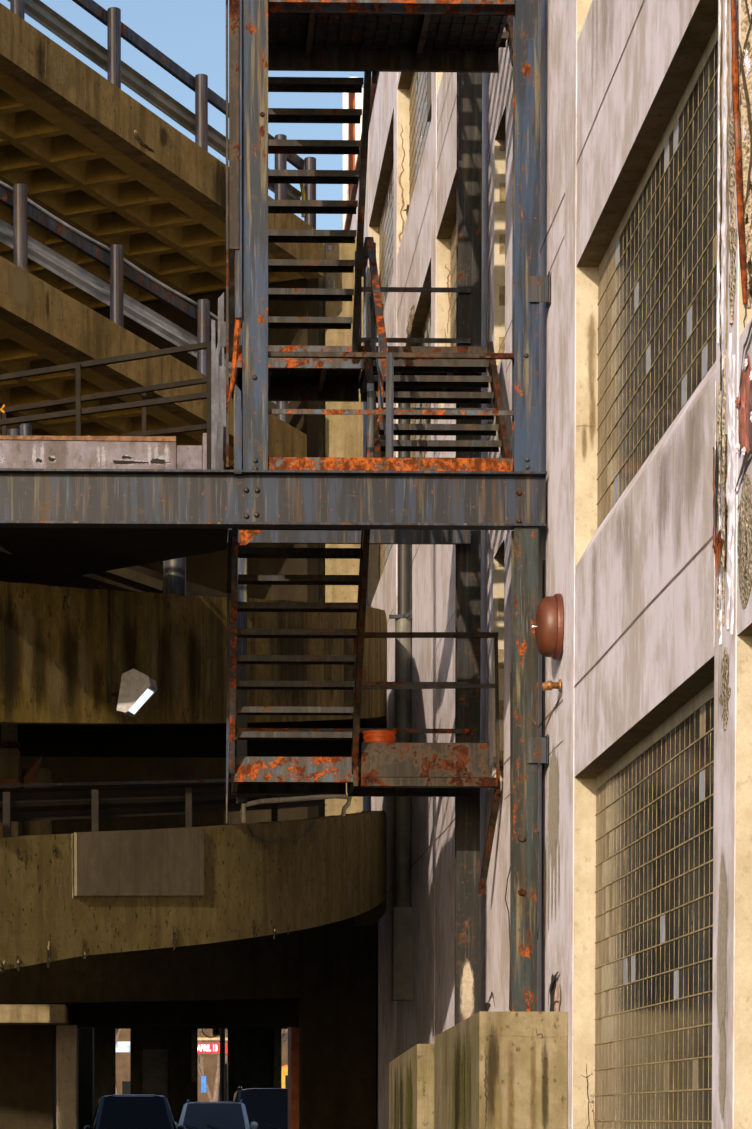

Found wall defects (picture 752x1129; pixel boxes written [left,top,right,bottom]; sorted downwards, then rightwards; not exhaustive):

rust [227,318,242,403]
leakage [0,606,210,709]
leakage [394,1072,411,1129]
leakage [453,1041,470,1129]
leakage [488,1038,499,1129]